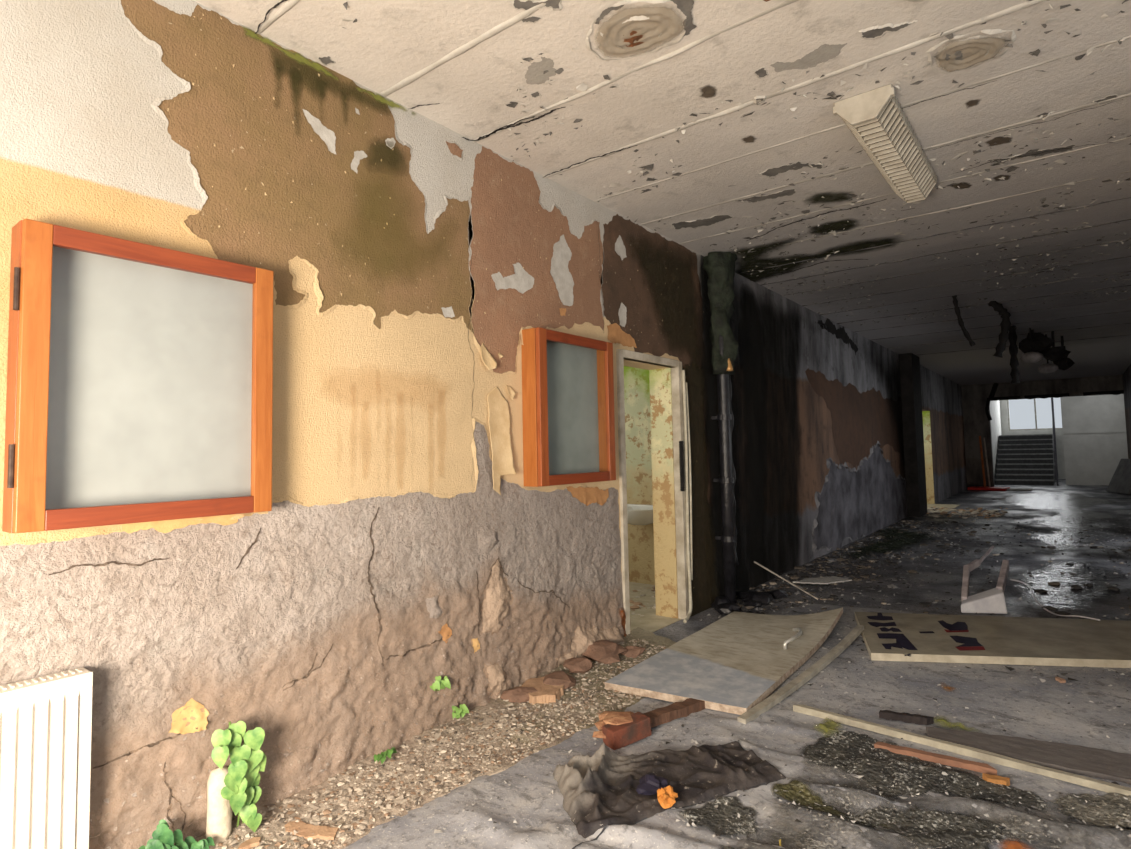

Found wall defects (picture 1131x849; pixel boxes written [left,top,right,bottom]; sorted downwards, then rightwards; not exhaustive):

crack [255,0,288,34]
peeling [119,0,1131,375]
water stain [808,193,851,203]
water stain [811,219,856,235]
water stain [632,239,896,617]
crack [49,558,169,575]
flaking render [0,385,708,849]
crack [367,507,569,666]
peeling [760,368,1131,846]
crack [93,728,198,833]
peeling [650,788,857,842]